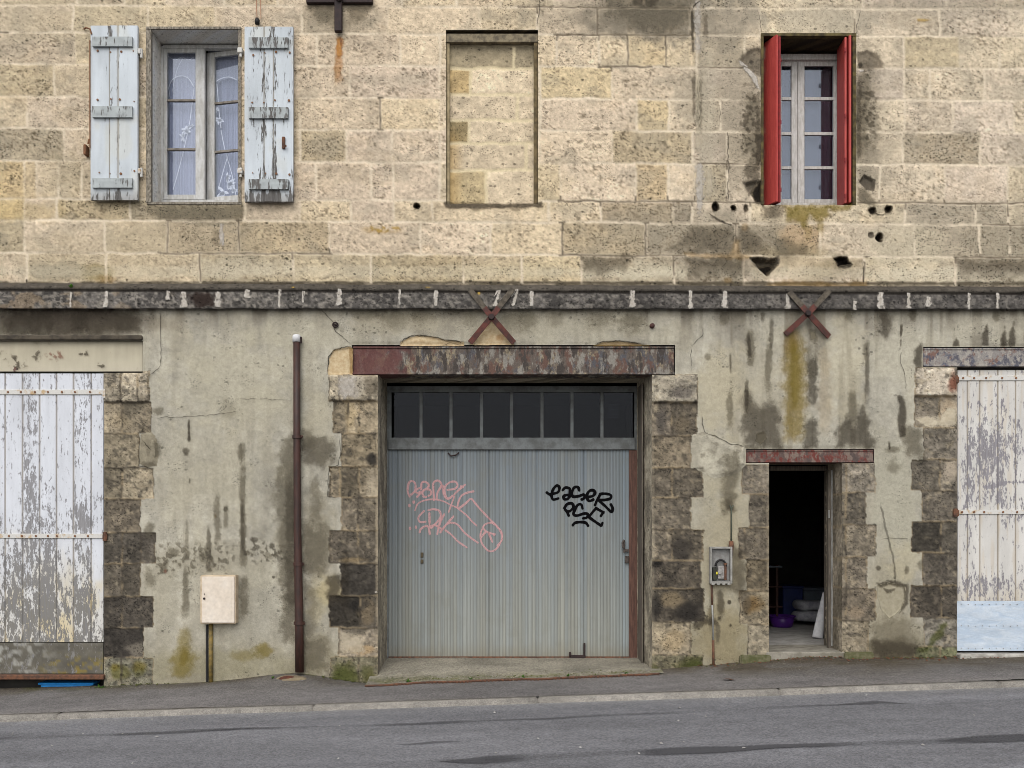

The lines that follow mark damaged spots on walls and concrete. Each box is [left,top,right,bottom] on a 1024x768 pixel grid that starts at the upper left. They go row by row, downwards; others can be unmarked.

hole [749,256,780,276]
spalling [400,321,514,346]
spalling [328,347,353,375]
damp [914,346,922,367]
damp [743,393,780,448]
damp [840,412,873,448]
damp [327,575,341,601]